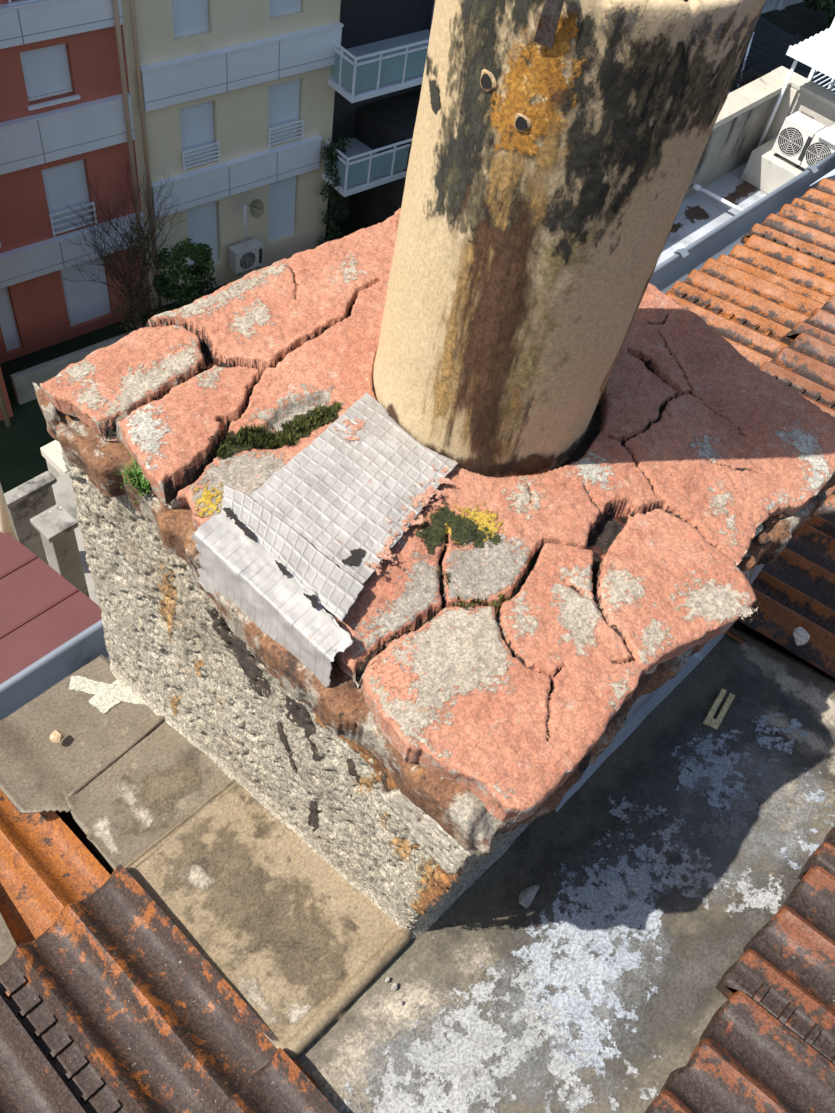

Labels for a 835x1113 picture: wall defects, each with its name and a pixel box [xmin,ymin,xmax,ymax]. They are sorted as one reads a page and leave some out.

corrosion [487,9,586,231]
peeling [55,261,287,470]
crack [102,289,364,506]
peeling [182,447,289,517]
peeling [249,383,344,432]
water stain [362,0,757,576]
crack [568,316,722,665]
spalling [206,606,270,702]
crack [276,695,391,792]
crack [475,542,563,741]
water stain [159,786,357,1024]
water stain [314,859,669,1113]